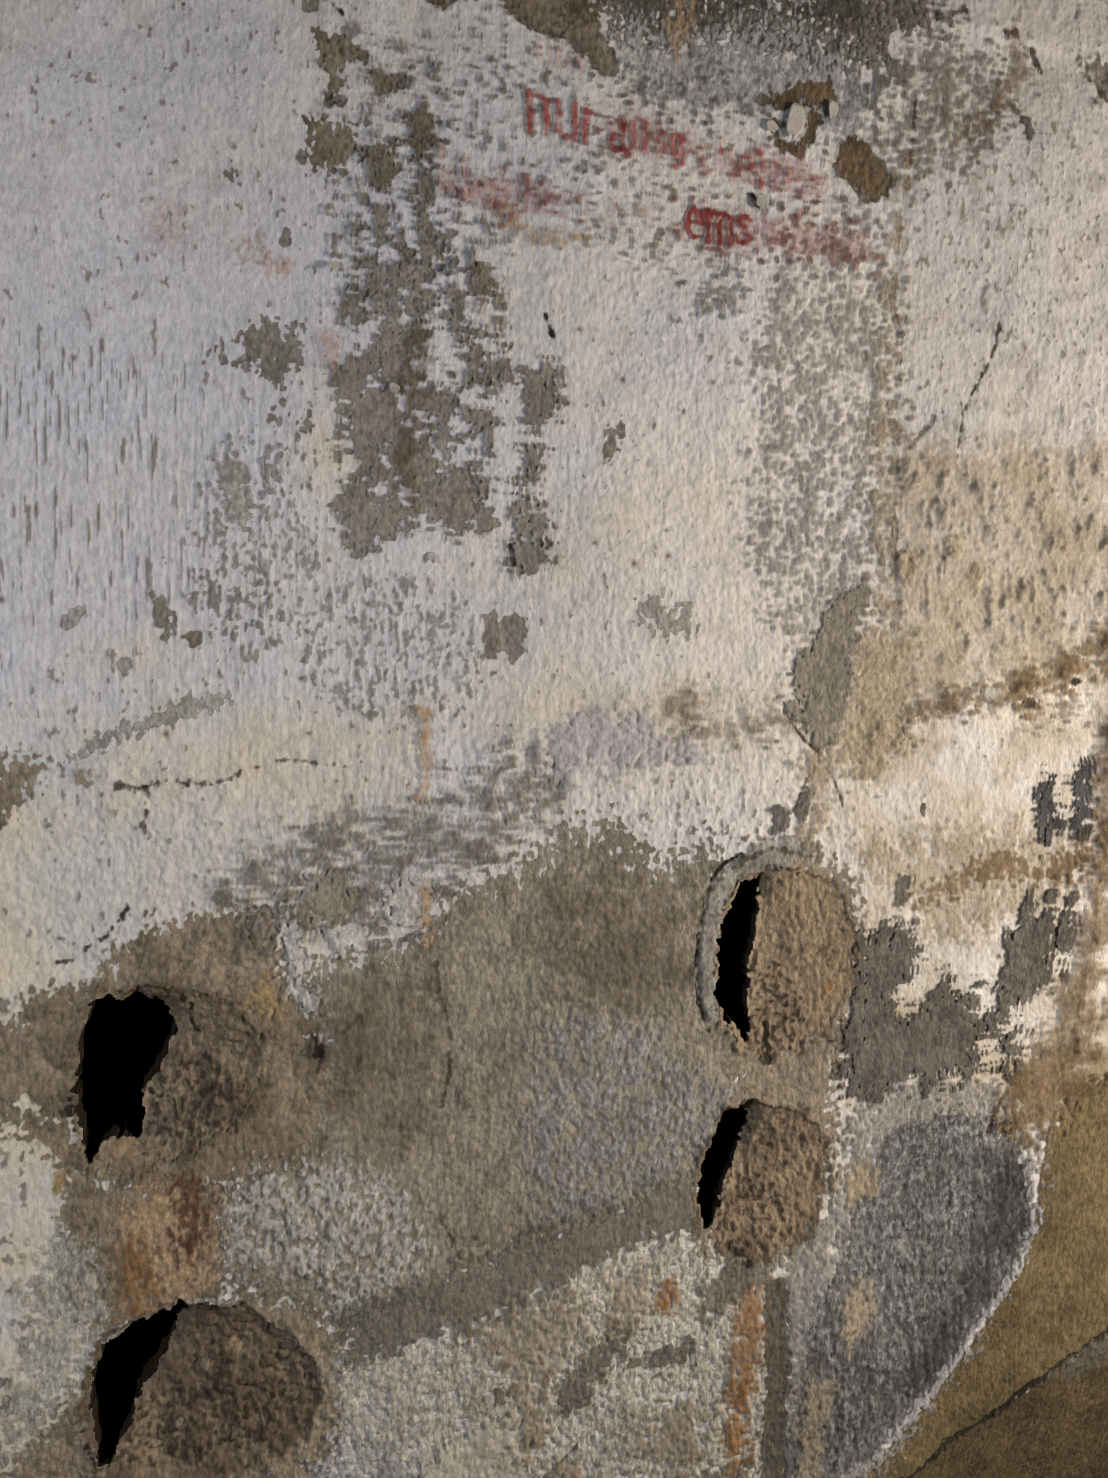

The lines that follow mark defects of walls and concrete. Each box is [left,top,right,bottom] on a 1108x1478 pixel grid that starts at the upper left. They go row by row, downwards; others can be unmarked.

peeling [149,0,1035,750]
crack [114,758,346,834]
peeling [0,724,1108,1478]
crack [907,1328,1108,1478]